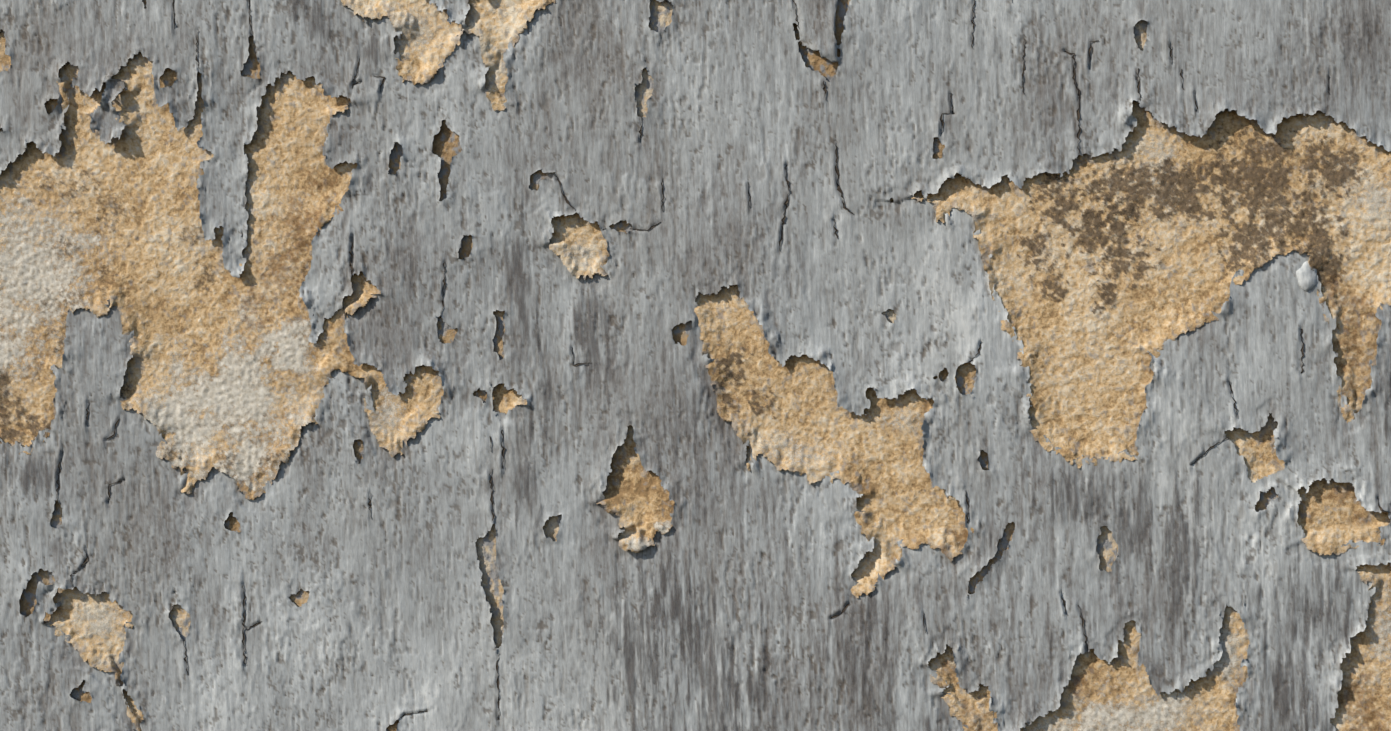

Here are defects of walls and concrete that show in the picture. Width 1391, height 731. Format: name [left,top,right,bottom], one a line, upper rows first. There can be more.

peeling [341,0,556,111]
peeling [432,120,463,201]
peeling [0,36,454,500]
peeling [458,235,473,259]
peeling [540,209,633,280]
peeling [890,96,1391,470]
peeling [593,419,683,553]
peeling [672,273,982,598]
peeling [968,522,1015,594]
peeling [1216,413,1391,731]
peeling [20,569,154,731]
peeling [923,596,1260,731]